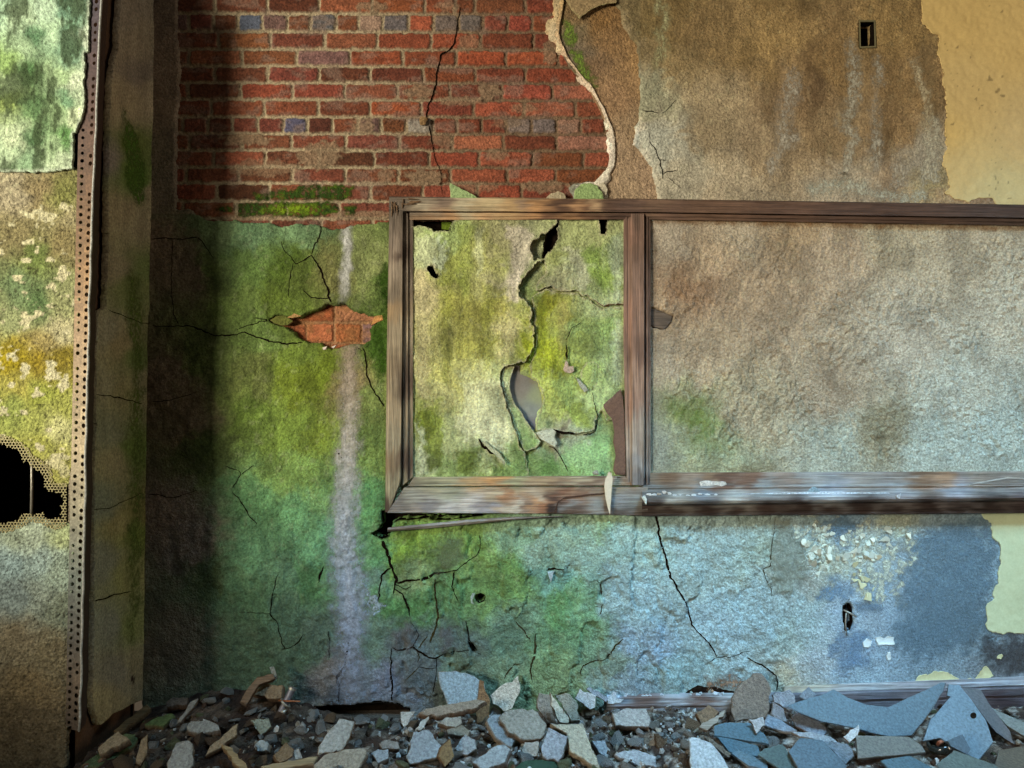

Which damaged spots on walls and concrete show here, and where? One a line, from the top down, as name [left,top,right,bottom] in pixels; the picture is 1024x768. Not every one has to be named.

spalling [176,0,657,230]
crack [426,7,461,191]
crack [281,225,331,302]
leakage [340,228,352,293]
peeling [406,212,625,484]
leakage [331,345,386,705]
crack [378,535,481,701]
crack [504,622,537,680]
crack [655,516,778,691]
peeling [793,514,917,602]
peeling [863,636,895,660]
peeling [915,654,1003,681]